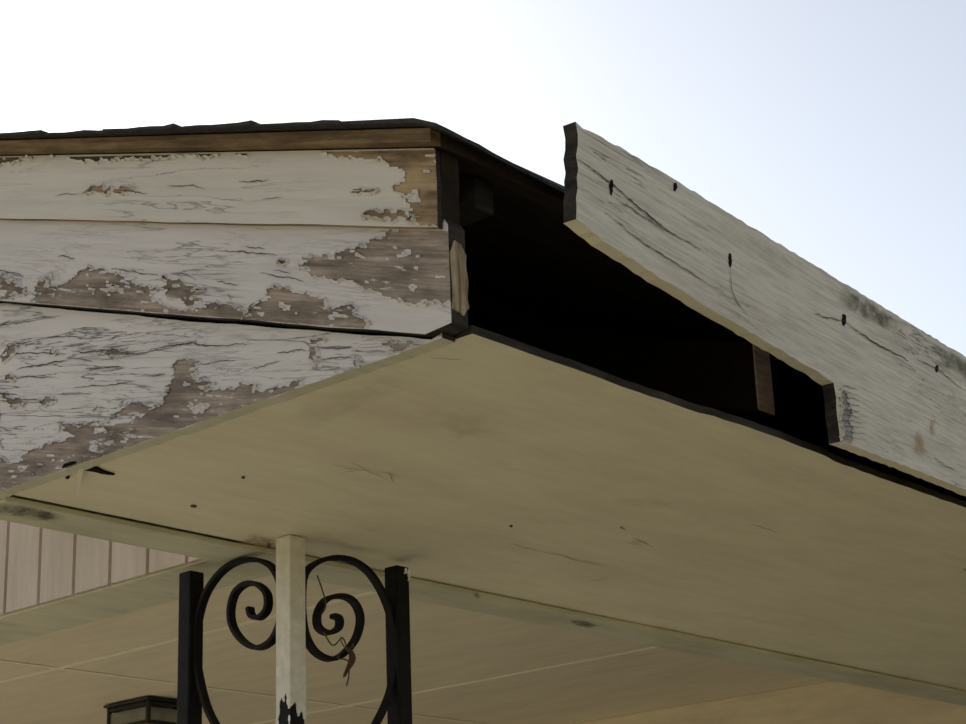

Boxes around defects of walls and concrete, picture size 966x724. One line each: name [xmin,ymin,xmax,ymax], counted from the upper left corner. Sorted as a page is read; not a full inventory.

peeling [81,182,137,197]
peeling [66,154,221,165]
peeling [275,150,451,308]
peeling [0,264,373,371]
peeling [0,342,58,410]
peeling [0,356,306,496]